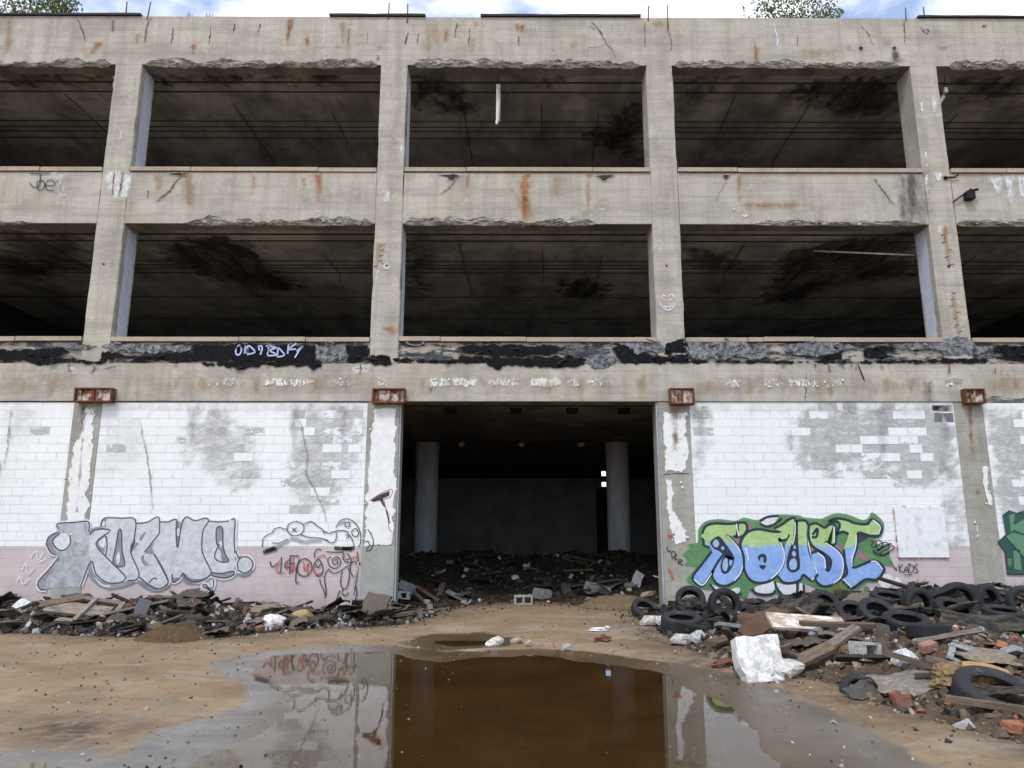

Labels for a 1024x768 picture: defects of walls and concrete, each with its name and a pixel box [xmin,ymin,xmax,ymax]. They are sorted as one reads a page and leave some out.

spalling [406,58,638,167]
damp [160,235,303,292]
peeling [0,217,1024,388]
crack [140,423,153,507]
crack [300,423,327,522]
peeling [281,407,398,546]
peeling [662,407,713,545]